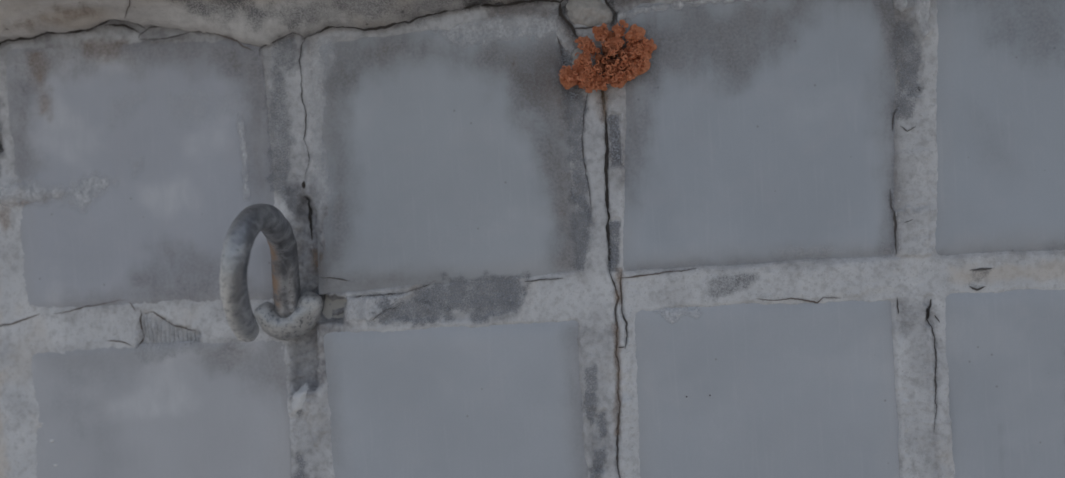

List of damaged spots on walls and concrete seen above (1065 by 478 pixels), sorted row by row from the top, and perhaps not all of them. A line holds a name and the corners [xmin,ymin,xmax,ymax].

crack [0,0,616,238]
crack [581,72,695,477]
crack [890,193,913,249]
crack [970,268,992,291]